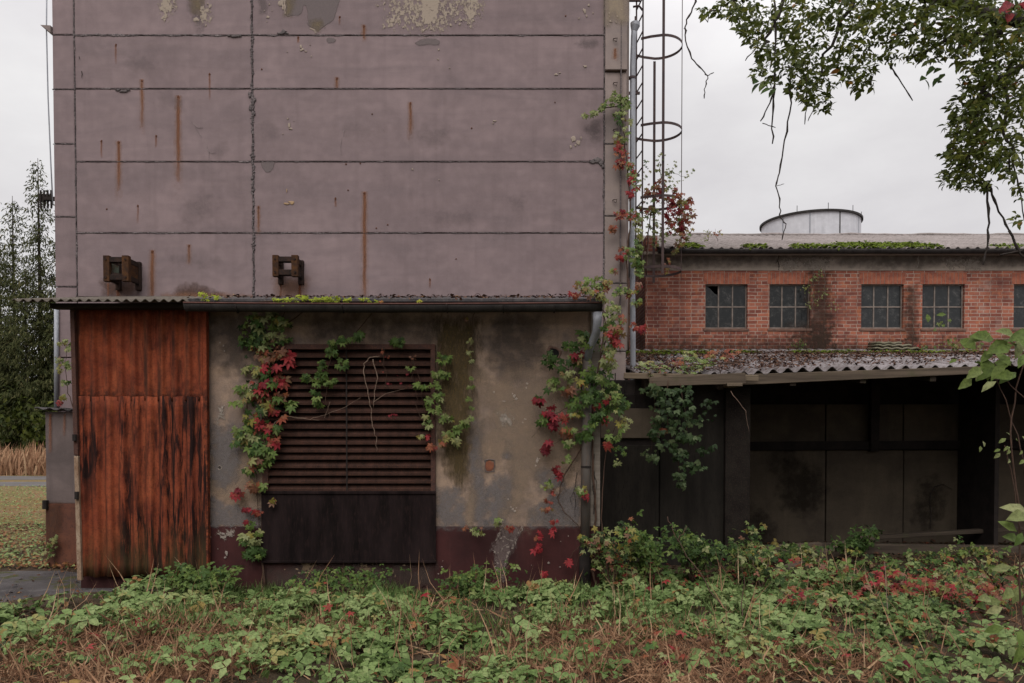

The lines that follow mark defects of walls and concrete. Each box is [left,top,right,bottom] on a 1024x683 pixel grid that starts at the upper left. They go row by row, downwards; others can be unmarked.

peeling [375,0,486,37]
rust [363,192,388,287]